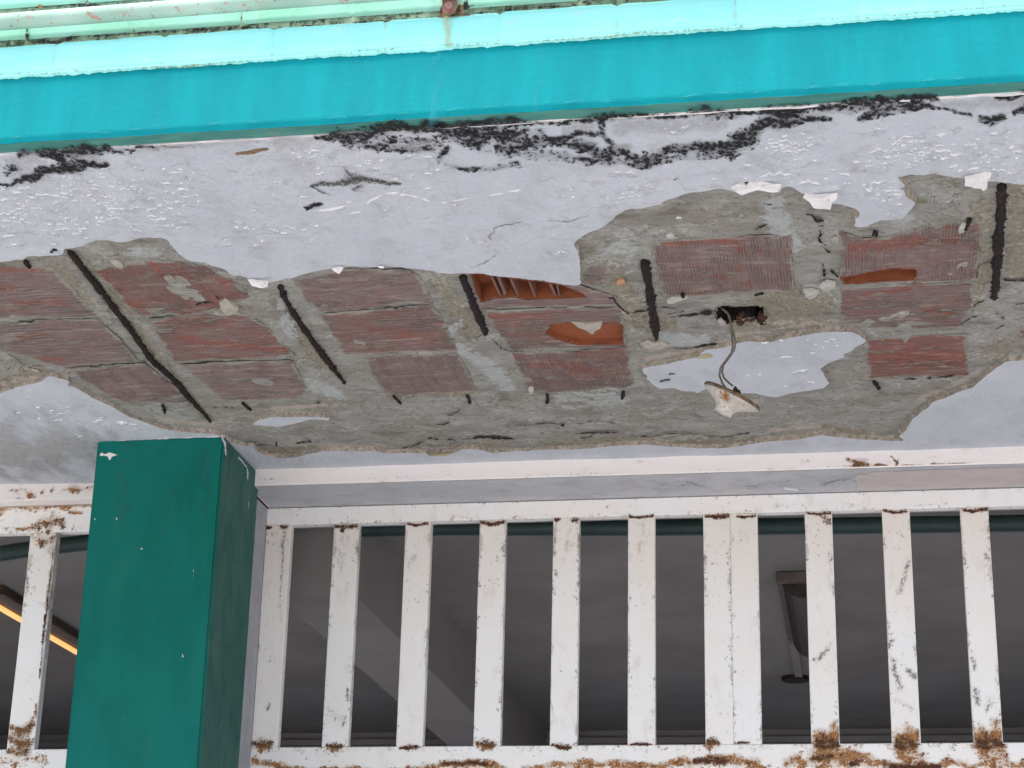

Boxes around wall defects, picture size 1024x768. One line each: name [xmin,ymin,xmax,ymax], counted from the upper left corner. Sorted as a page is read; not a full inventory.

leakage [313,90,1024,173]
leakage [0,144,166,188]
leakage [304,166,401,211]
flaking render [0,172,1024,480]
corrosion [0,484,93,679]
corrosion [784,687,1024,768]
corrosion [251,738,304,768]
corrosion [394,738,505,768]
corrosion [529,736,767,768]